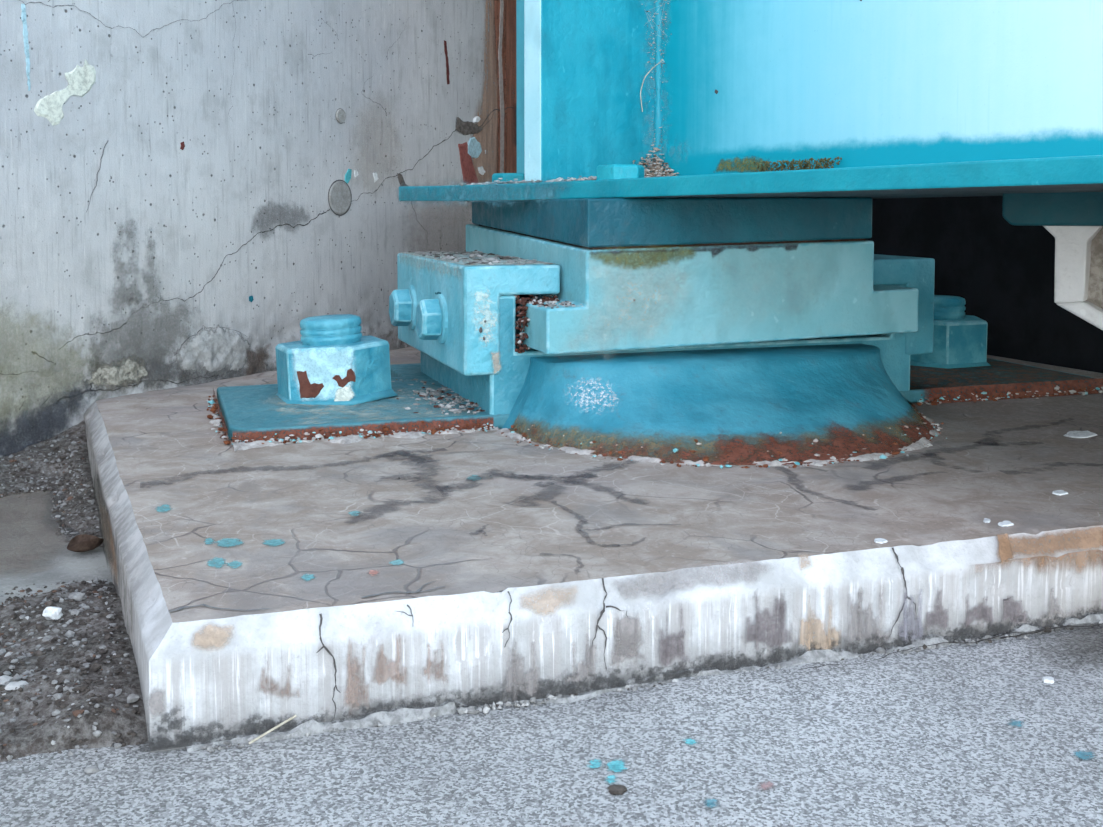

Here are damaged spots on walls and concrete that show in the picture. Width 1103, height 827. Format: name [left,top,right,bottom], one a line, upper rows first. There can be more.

crack [0,107,514,375]
water stain [0,382,96,457]
spalling [85,356,150,389]
water stain [146,345,277,385]
peeling [297,368,356,399]
rust [213,391,493,442]
rust [510,399,934,465]
rust [924,378,1103,404]
rust [999,527,1103,569]
crack [592,578,628,670]
crack [889,547,917,636]
crack [316,613,341,718]